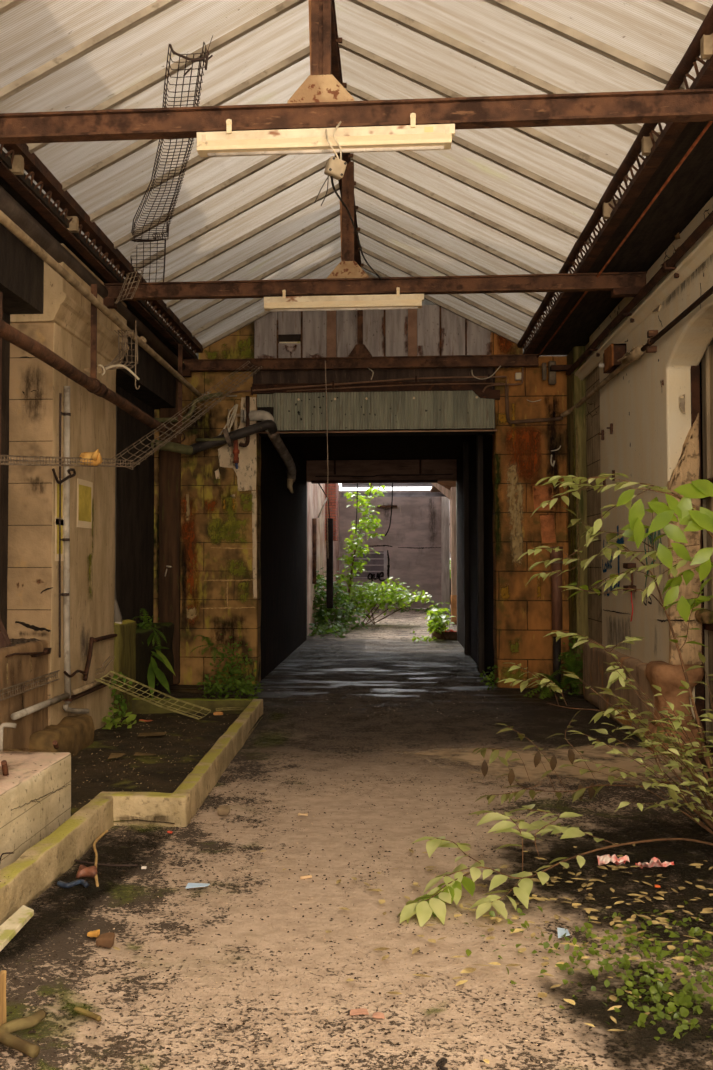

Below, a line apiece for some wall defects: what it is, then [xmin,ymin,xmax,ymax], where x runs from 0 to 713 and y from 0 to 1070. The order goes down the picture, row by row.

leakage [495,454,523,563]
leakage [548,414,591,615]